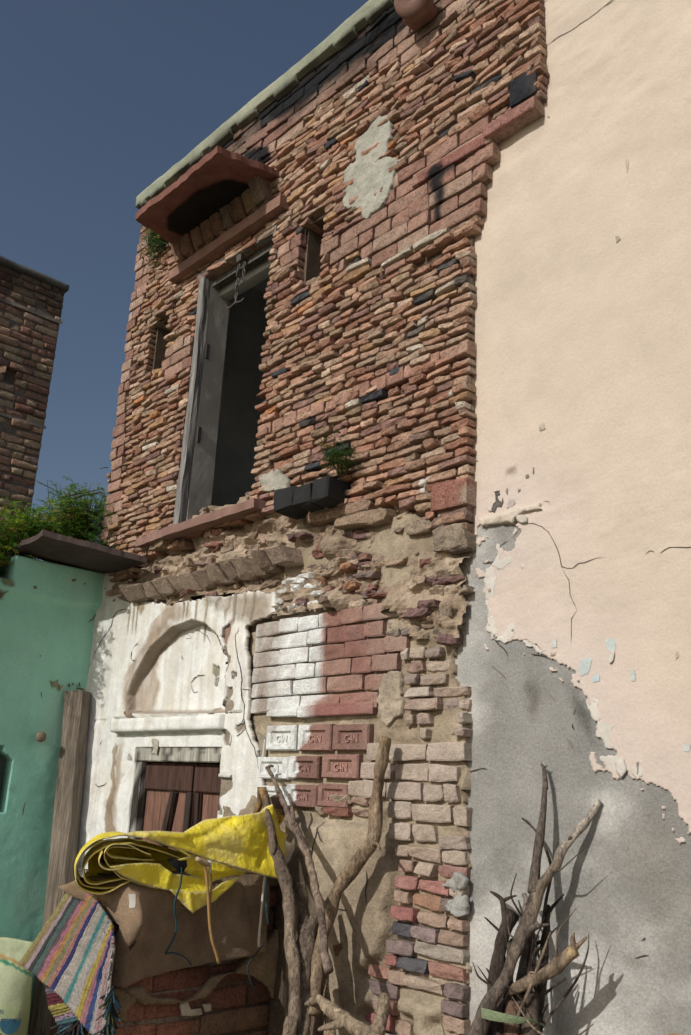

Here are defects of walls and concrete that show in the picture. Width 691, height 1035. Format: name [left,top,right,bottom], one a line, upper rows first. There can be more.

crack [548,0,614,45]
crack [526,501,605,622]
peeling [115,467,691,1035]